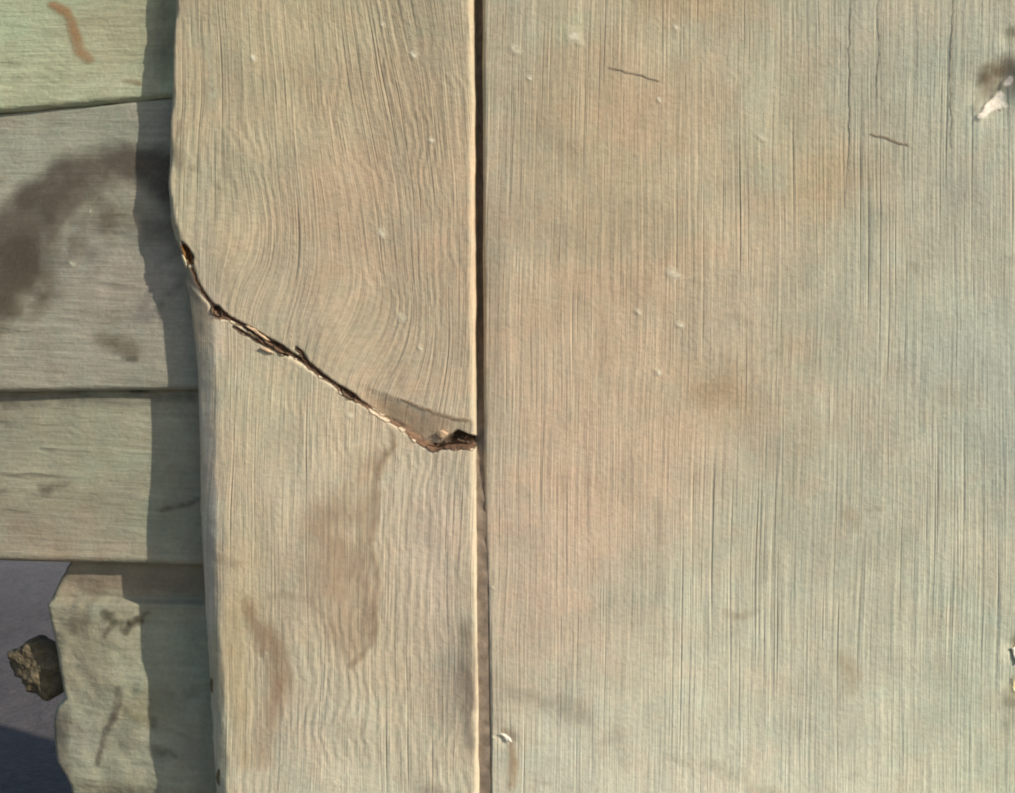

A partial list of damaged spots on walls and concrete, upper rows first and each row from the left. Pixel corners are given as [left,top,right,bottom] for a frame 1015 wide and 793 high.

corrosion [49,2,90,60]
damp [0,147,170,313]
crack [190,267,478,452]